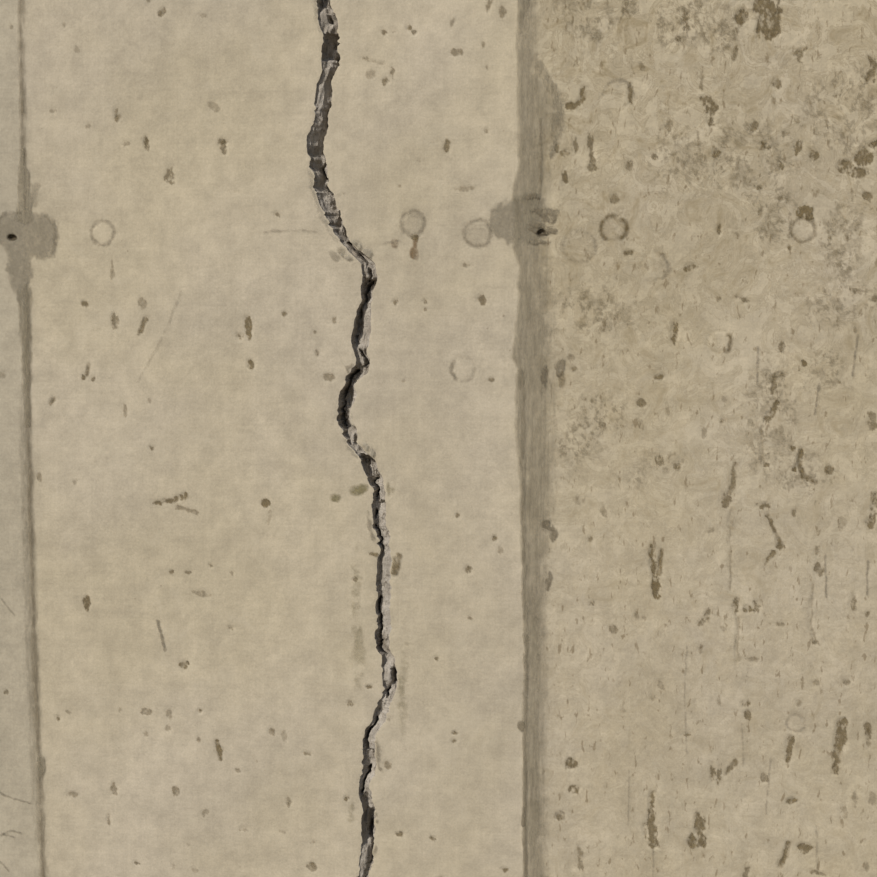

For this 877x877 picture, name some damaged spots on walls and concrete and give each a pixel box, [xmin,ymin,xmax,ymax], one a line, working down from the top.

crack [306,0,401,877]